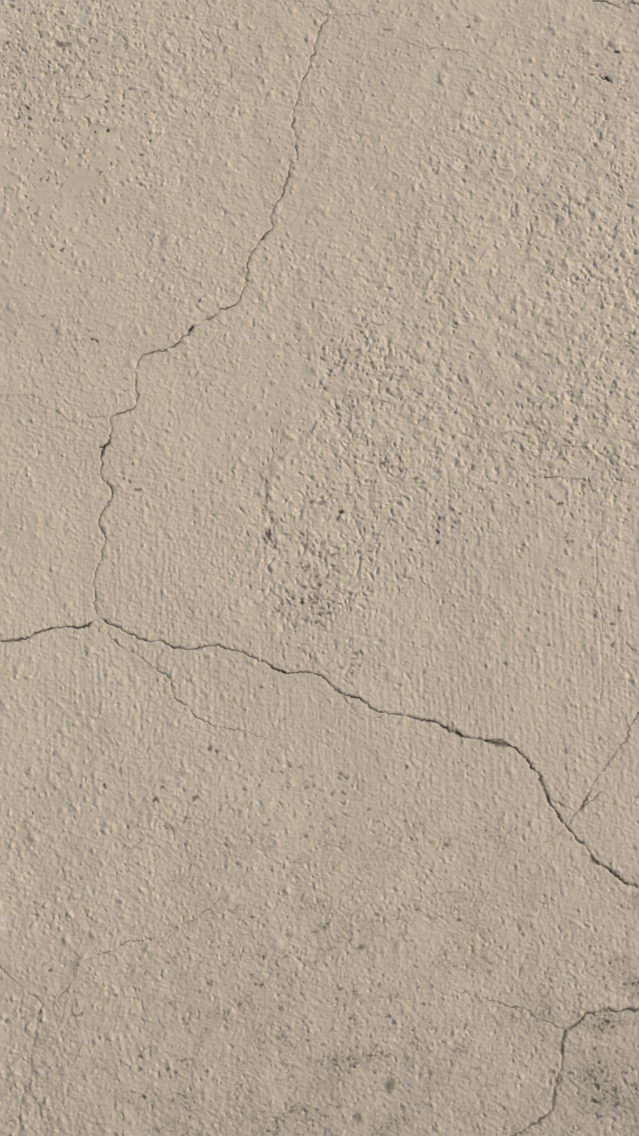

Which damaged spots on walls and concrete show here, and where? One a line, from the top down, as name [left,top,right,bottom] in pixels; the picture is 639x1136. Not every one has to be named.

crack [1,1,638,888]
crack [531,1008,638,1125]